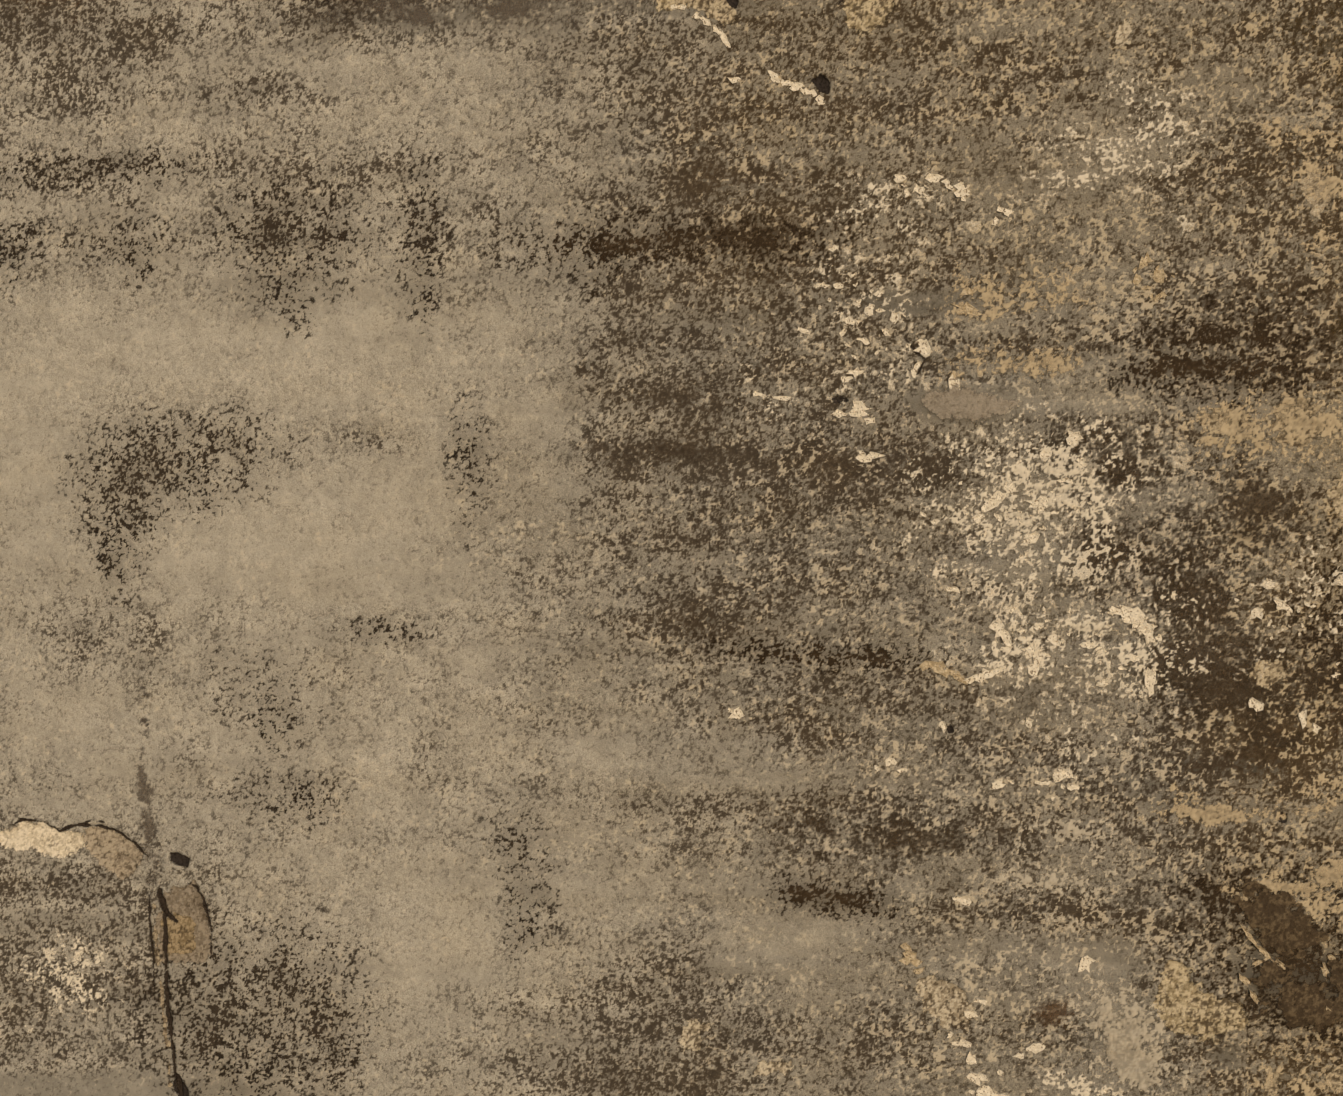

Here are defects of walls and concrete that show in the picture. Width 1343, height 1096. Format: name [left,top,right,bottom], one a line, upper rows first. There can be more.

spalling [656,0,737,48]
spalling [842,0,895,36]
peeling [963,430,1092,567]
peeling [919,604,1162,698]
spalling [0,821,143,880]
crack [12,818,149,857]
spalling [153,879,214,968]
crack [148,883,213,1096]
peeling [1320,954,1336,977]